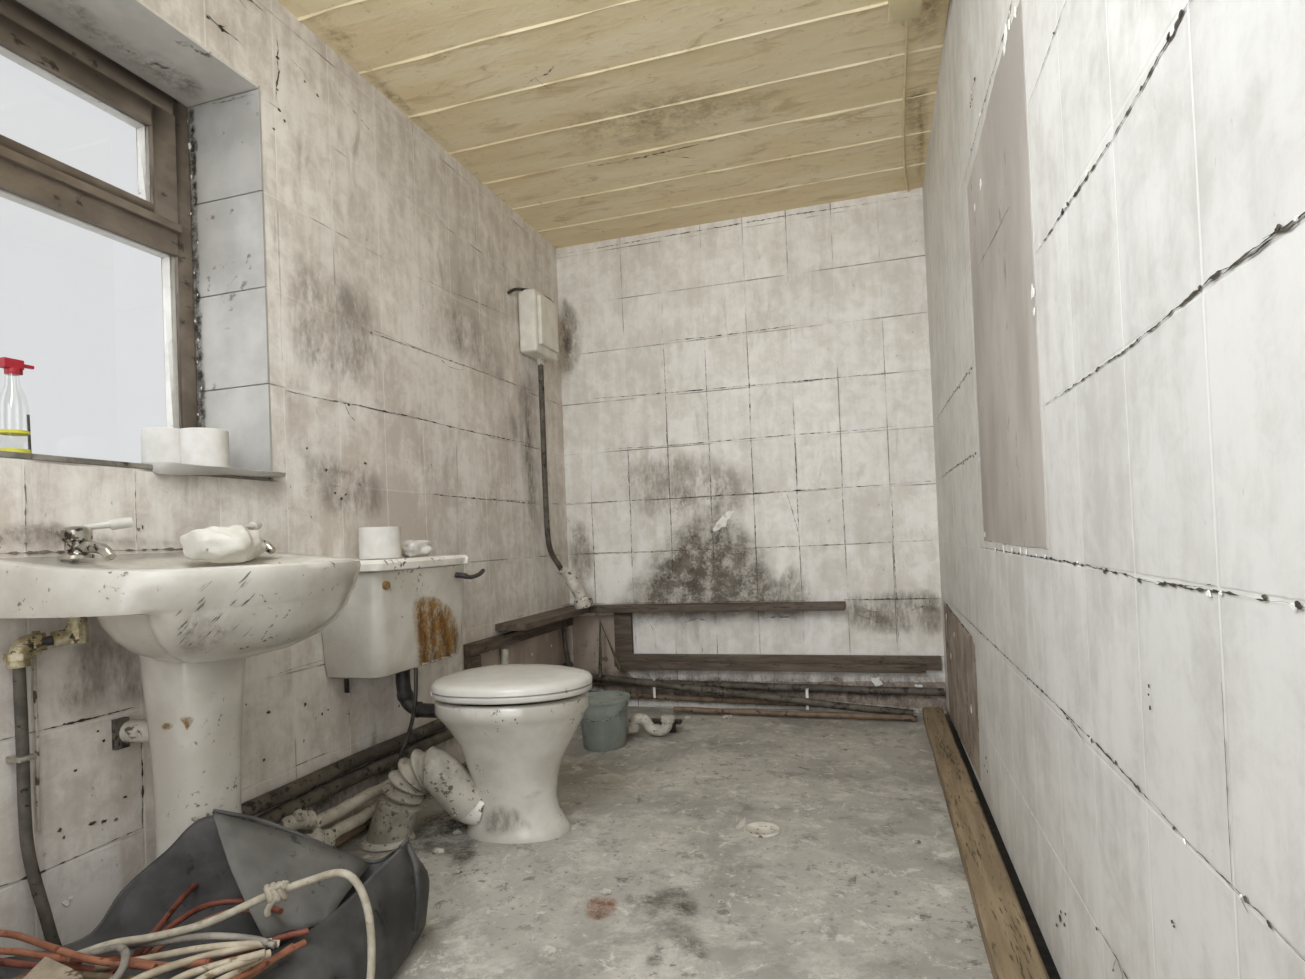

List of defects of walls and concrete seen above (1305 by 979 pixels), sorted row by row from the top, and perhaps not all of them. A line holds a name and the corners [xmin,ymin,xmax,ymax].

crack [1035,0,1190,254]
flaking render [966,0,1048,556]
crack [1044,212,1305,406]
flaking render [481,602,988,781]
crack [423,313,1305,979]